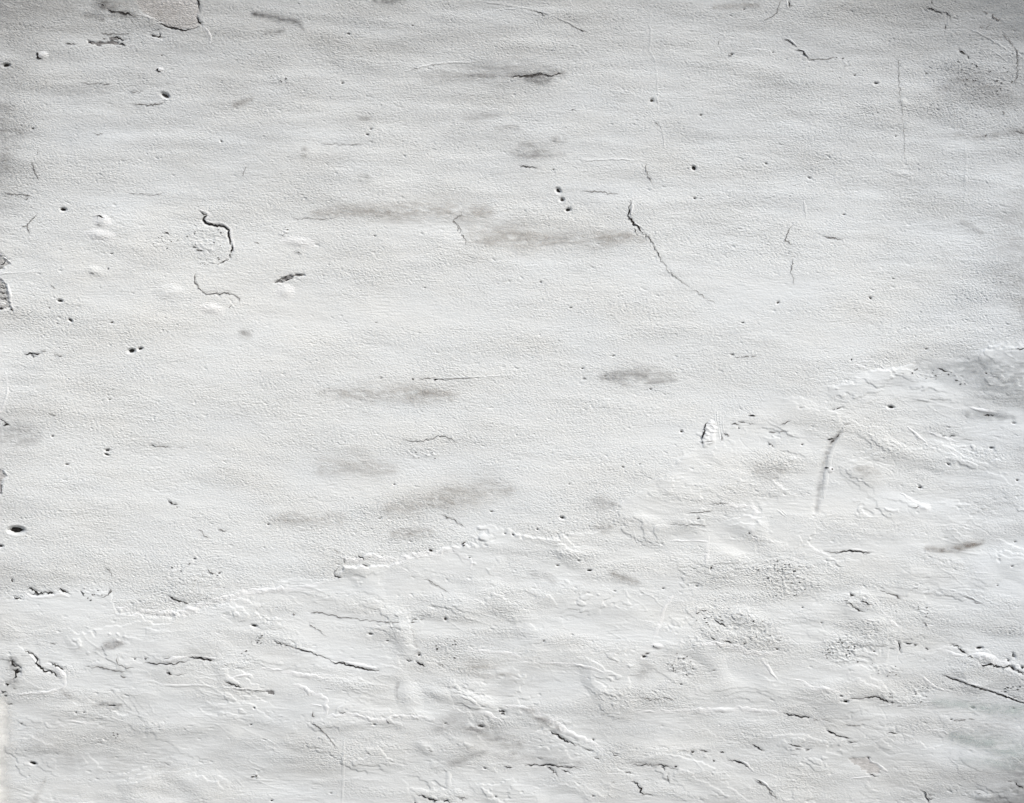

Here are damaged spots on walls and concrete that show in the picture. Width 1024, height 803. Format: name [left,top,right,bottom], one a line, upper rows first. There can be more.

crack [102,29,164,42]
crack [765,0,833,61]
crack [200,209,259,263]
crack [581,190,714,302]
crack [194,276,240,308]
crack [2,643,267,704]
crack [260,612,423,671]
crack [898,623,1024,703]